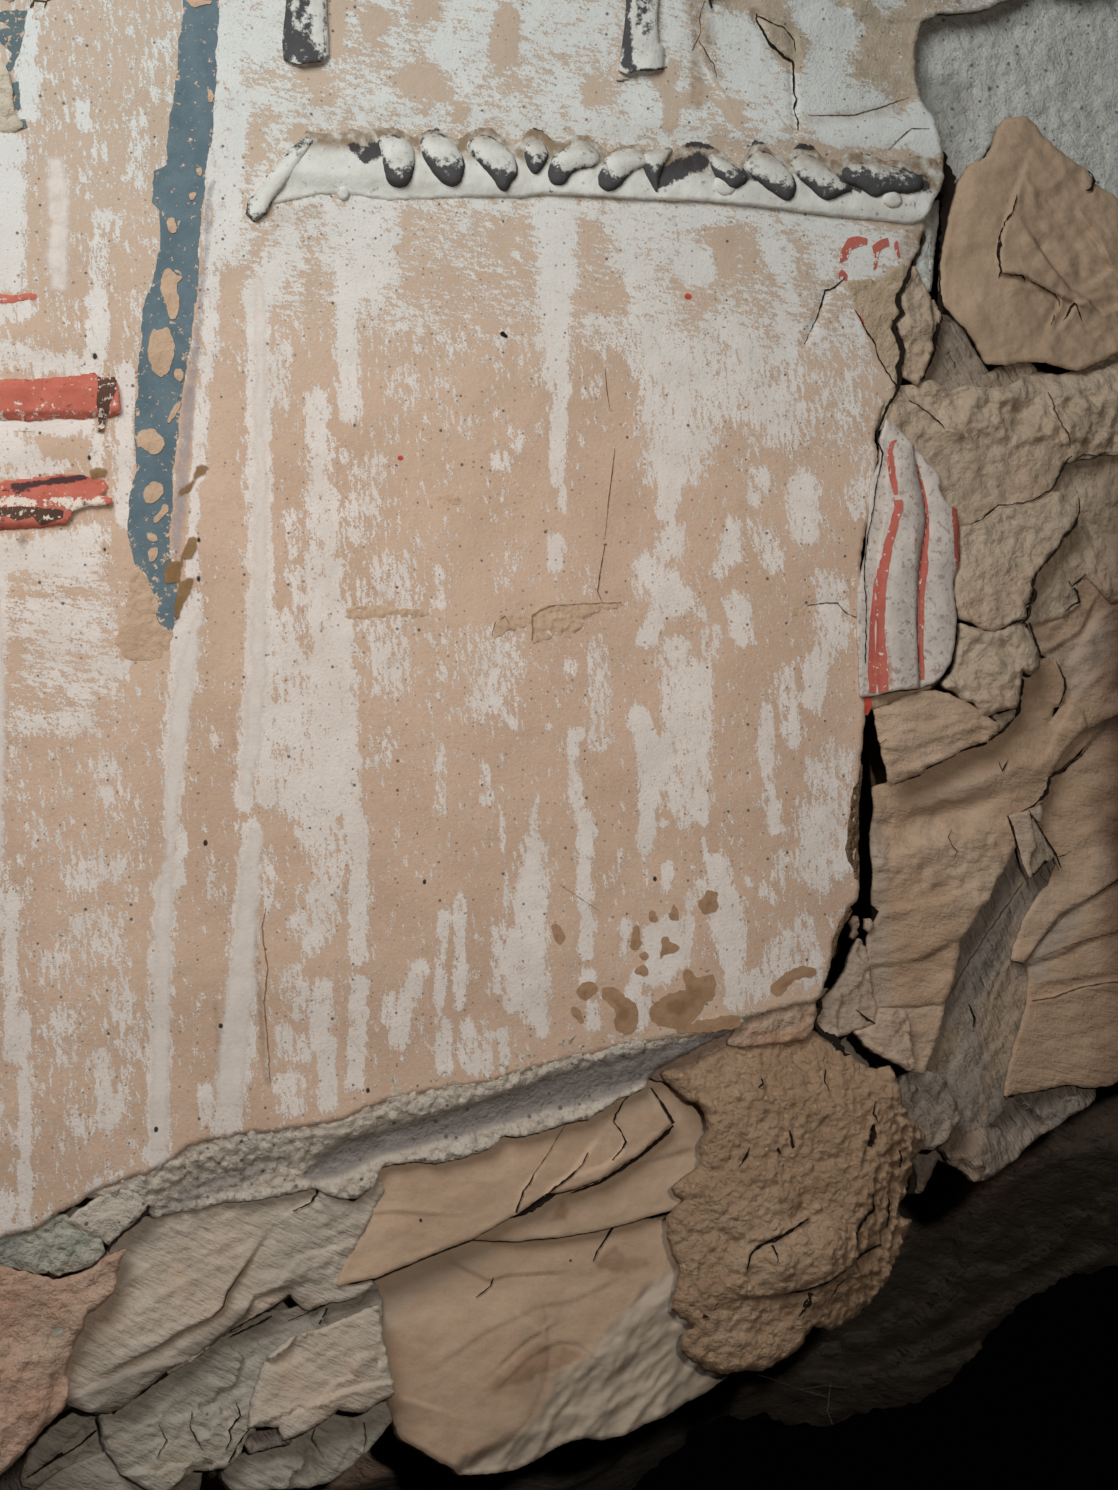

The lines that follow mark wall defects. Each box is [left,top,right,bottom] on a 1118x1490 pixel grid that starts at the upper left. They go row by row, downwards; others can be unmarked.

spalling [0,57,23,133]
spalling [848,236,923,380]
spalling [823,696,874,989]
peeling [1008,805,1055,878]
crack [373,1087,675,1283]